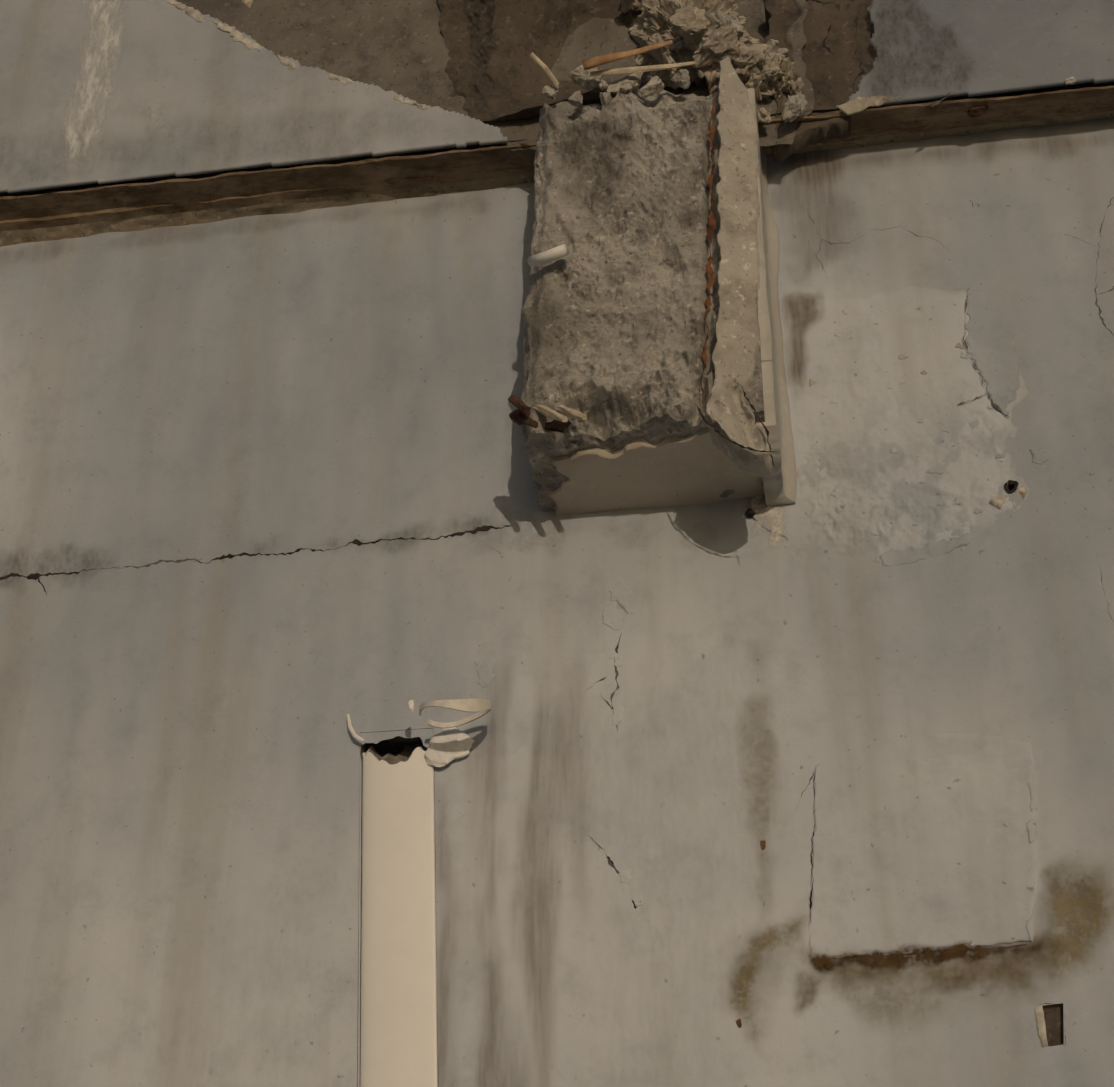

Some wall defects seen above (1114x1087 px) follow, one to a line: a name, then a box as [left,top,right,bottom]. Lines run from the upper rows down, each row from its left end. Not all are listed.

spalling [167,0,711,151]
spalling [734,0,902,162]
crack [1065,197,1114,335]
rust [509,407,531,425]
rust [544,419,572,430]
crack [0,525,512,595]
crack [586,634,622,731]
rust [733,925,796,1028]
rust [812,877,1108,983]
spalling [1034,1005,1048,1048]